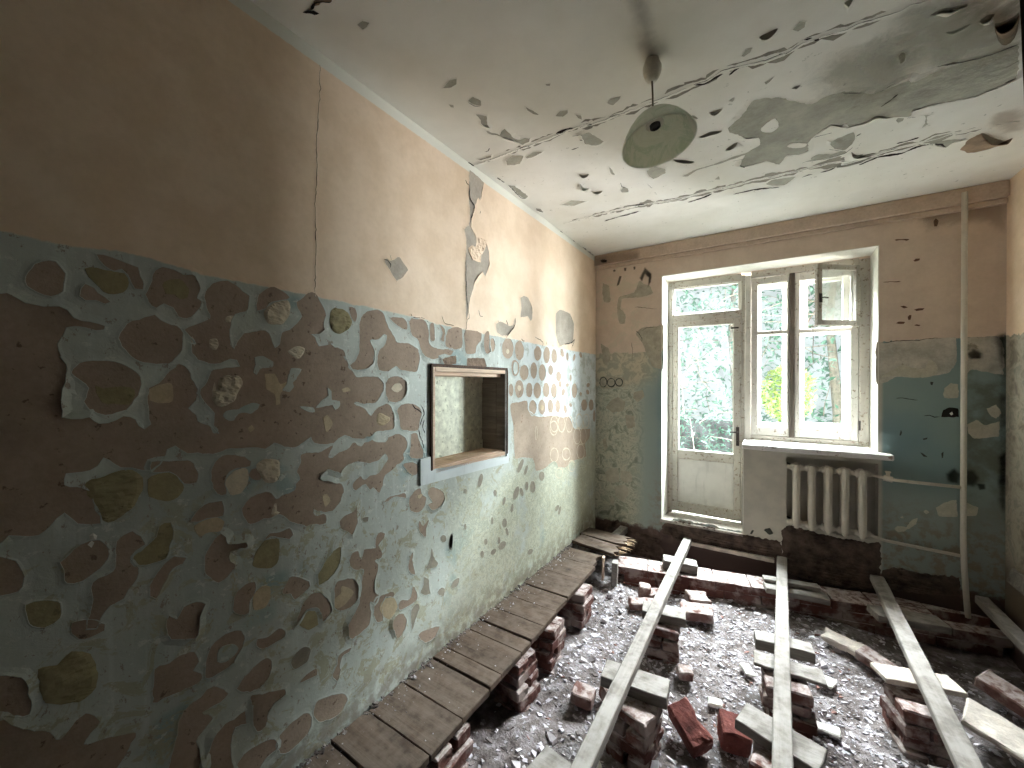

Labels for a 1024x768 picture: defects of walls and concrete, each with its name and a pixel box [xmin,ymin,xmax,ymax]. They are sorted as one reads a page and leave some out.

peeling [303,0,336,15]
peeling [643,4,1023,187]
crack [311,65,323,297]
peeling [606,166,631,193]
peeling [614,279,664,371]
peeling [875,305,1006,386]
peeling [0,95,627,768]
spalling [939,406,960,419]
spalling [602,517,963,600]